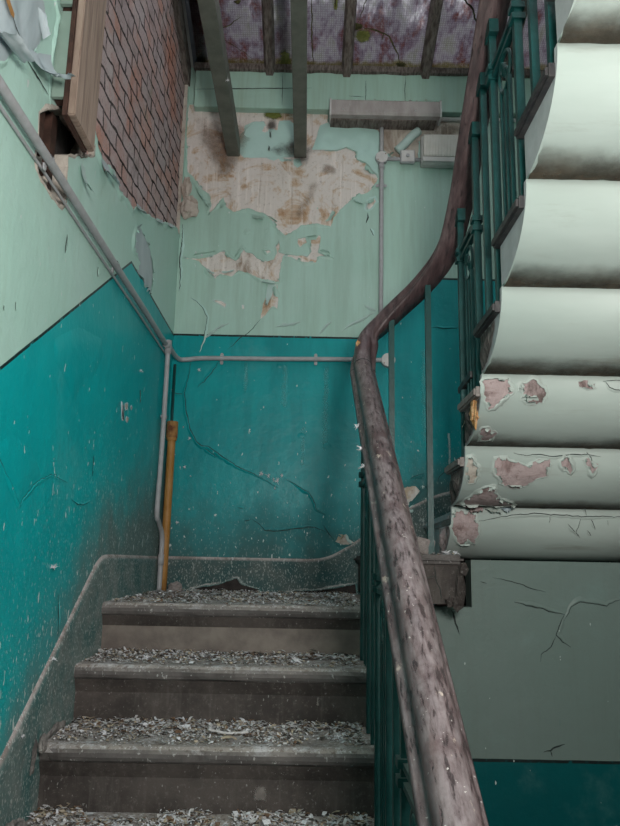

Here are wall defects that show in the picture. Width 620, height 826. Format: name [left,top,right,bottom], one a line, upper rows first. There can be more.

peeling [0,0,75,94]
peeling [34,0,460,319]
crack [170,224,335,540]
peeling [479,375,549,412]
crack [604,380,620,393]
peeling [449,453,599,548]